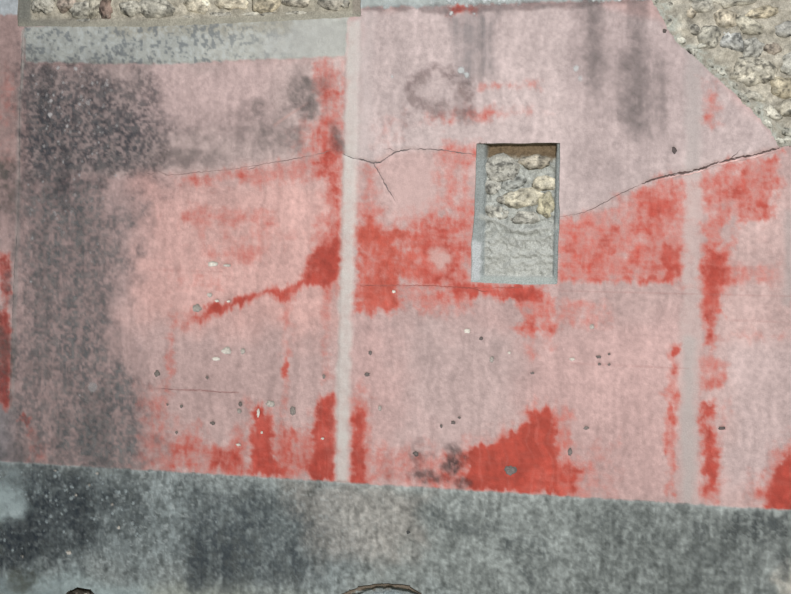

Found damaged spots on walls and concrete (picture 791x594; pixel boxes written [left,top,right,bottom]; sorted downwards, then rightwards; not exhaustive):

crack [148,148,471,199]
crack [574,148,779,215]
damp [12,180,138,467]
efflorescence [0,480,27,522]
damp [188,489,308,584]
damp [721,513,787,545]